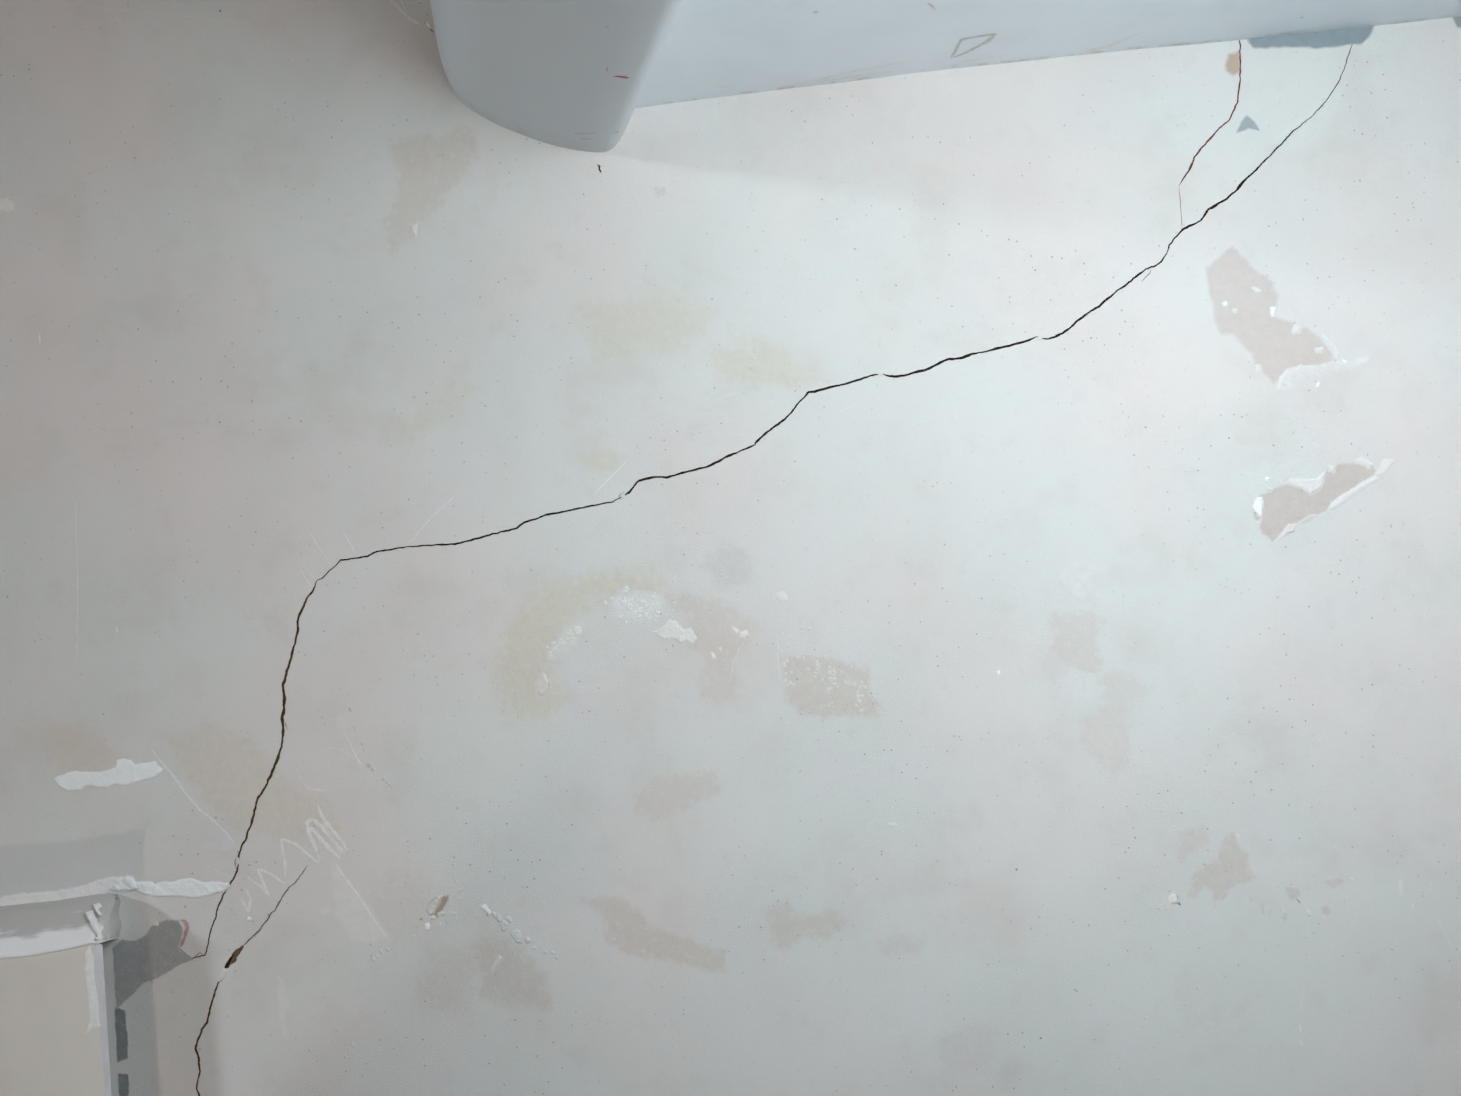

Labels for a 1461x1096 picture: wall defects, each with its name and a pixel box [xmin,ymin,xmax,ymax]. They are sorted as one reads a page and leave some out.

peeling [1201,242,1373,393]
crack [181,40,1352,1096]
peeling [1249,455,1396,546]